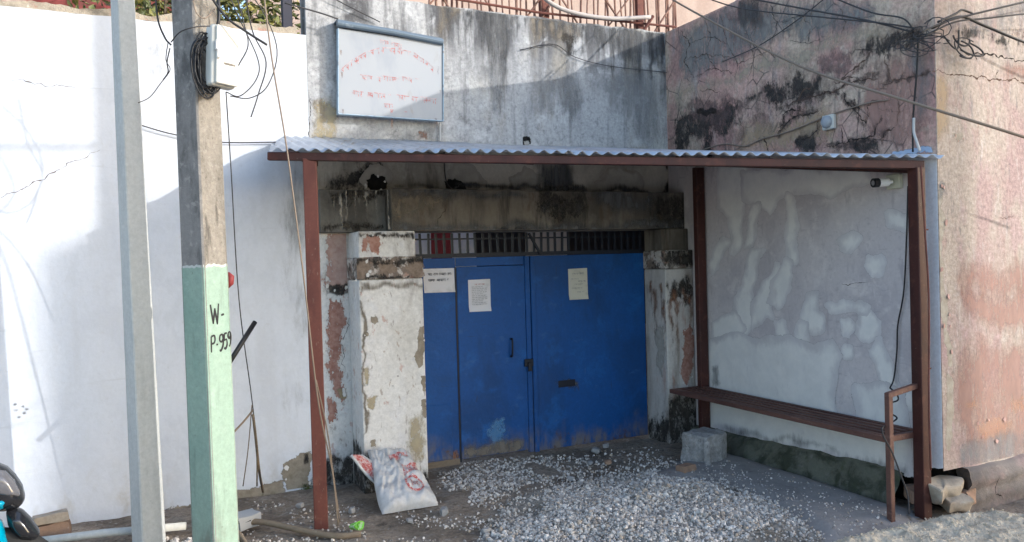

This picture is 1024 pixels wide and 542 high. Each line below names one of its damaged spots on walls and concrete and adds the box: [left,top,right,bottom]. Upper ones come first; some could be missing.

crack [1,152,94,198]
water stain [324,162,684,239]
water stain [440,7,666,132]
water stain [666,51,822,170]
crack [682,5,846,93]
mould [848,135,879,153]
crack [738,50,1024,158]
peeling [360,301,380,447]
peeling [321,234,427,424]
peeling [655,326,665,377]
peeling [679,324,694,387]
spalling [237,451,312,499]